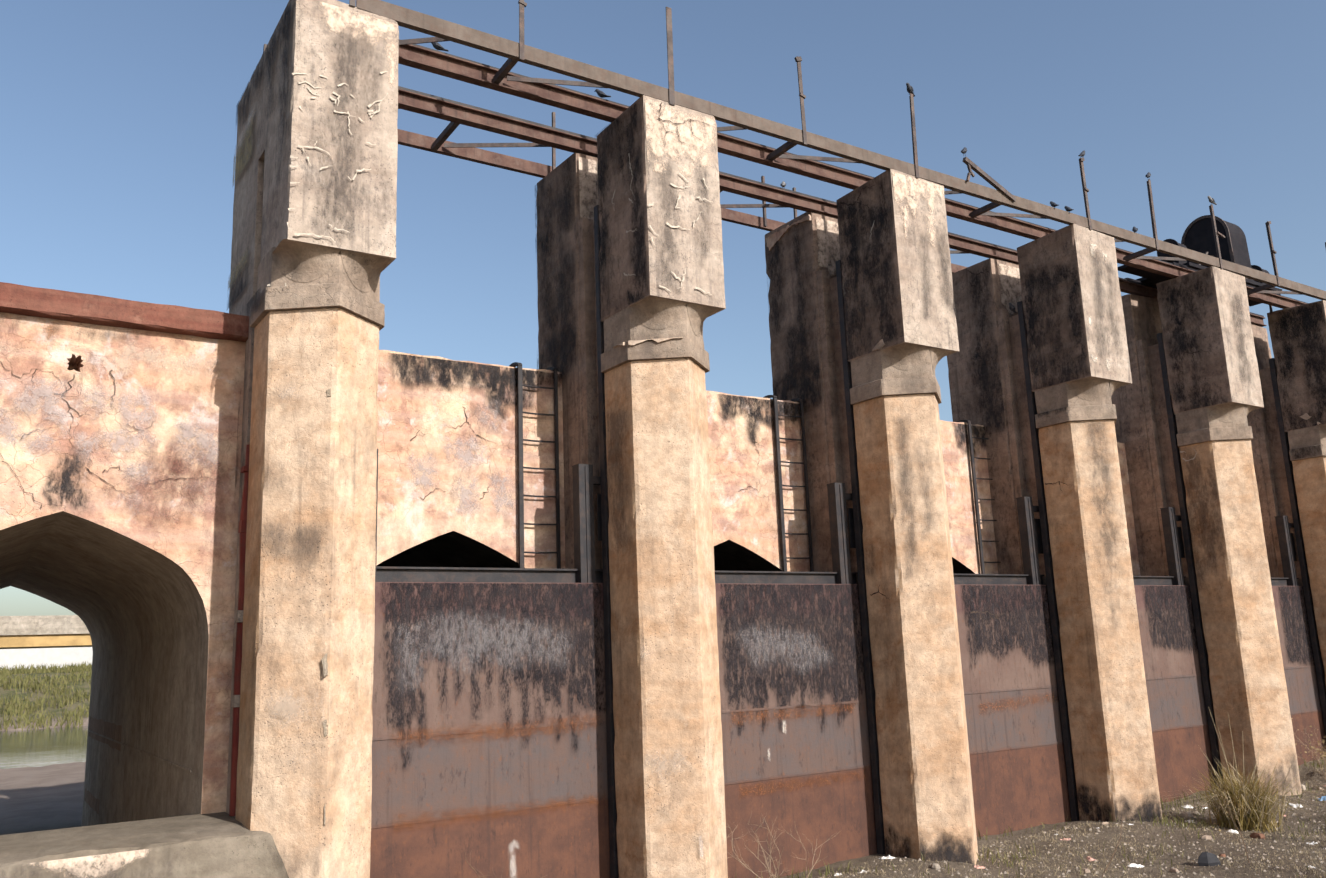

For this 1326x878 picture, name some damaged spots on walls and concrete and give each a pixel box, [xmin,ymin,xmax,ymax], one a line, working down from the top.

crack [0,361,210,508]
damp [382,583,606,768]
damp [720,584,864,735]
damp [962,585,1055,667]
damp [1142,557,1216,652]